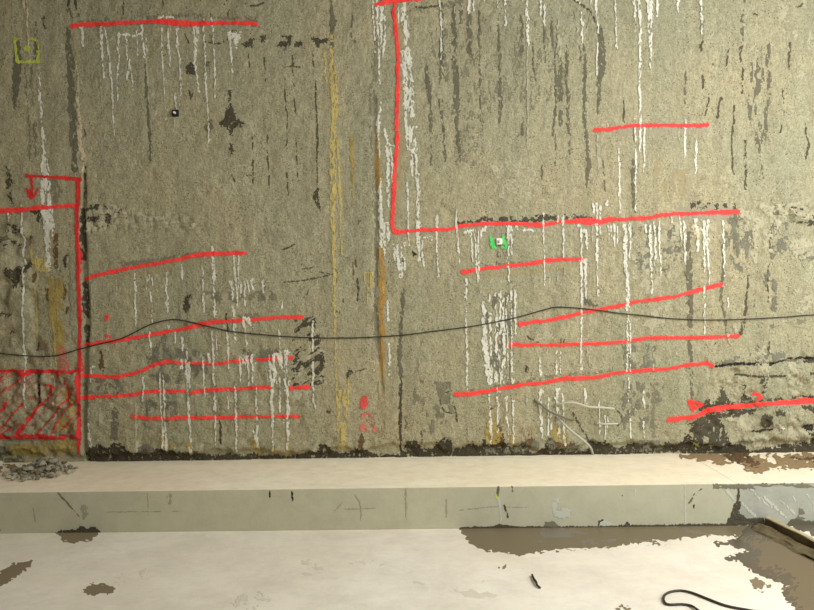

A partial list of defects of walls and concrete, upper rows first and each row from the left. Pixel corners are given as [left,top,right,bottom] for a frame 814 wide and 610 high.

crack [699,40,791,190]
crack [803,123,811,160]
corrosion [323,34,355,451]
leakage [81,0,814,462]
crack [739,232,772,335]
spalling [753,272,779,312]
spalling [754,345,773,377]
crack [714,341,814,378]
spalling [785,359,814,399]
spalling [769,408,811,449]
crack [801,424,814,443]